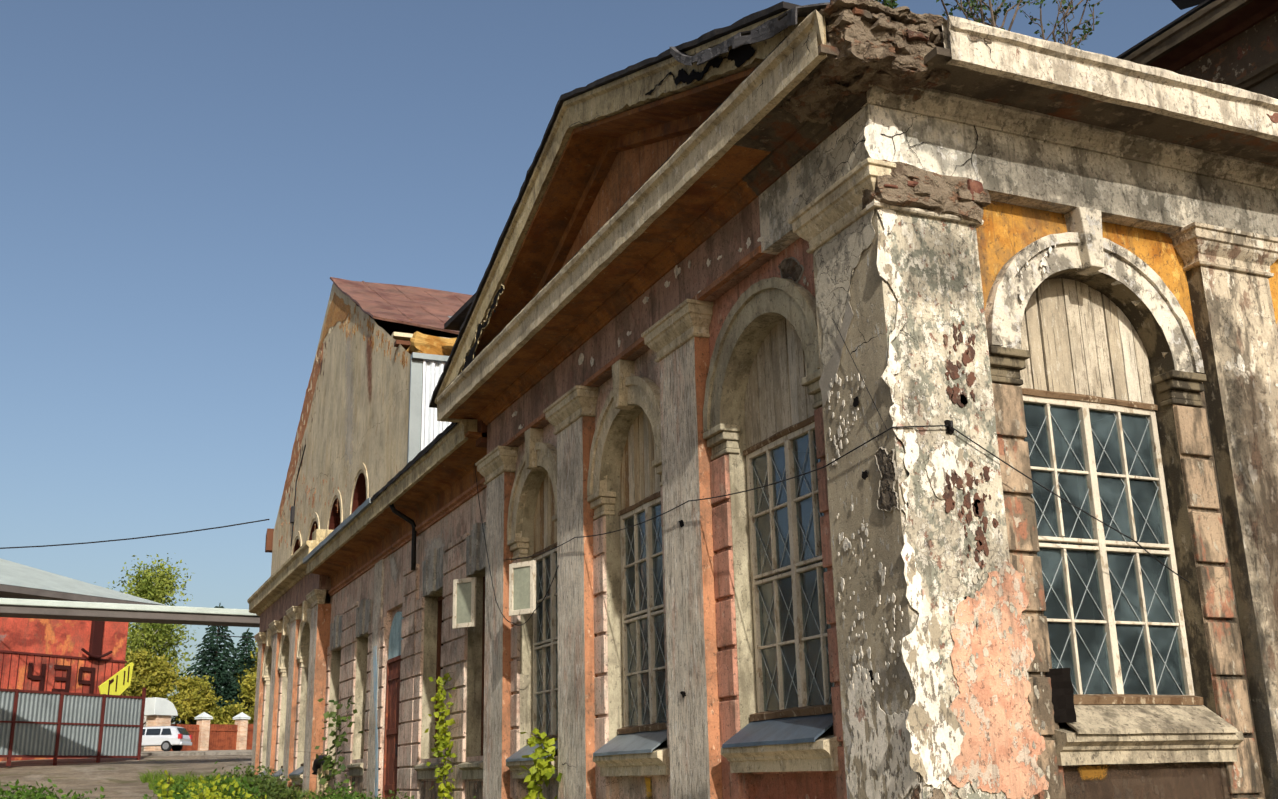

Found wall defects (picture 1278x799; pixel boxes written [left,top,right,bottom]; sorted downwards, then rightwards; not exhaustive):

spalling [645,44,756,95]
spalling [779,0,951,215]
crack [826,114,978,186]
spalling [967,35,992,43]
crack [827,268,921,354]
peeling [777,208,1056,799]
water stain [1199,379,1278,795]
water stain [1063,762,1254,799]